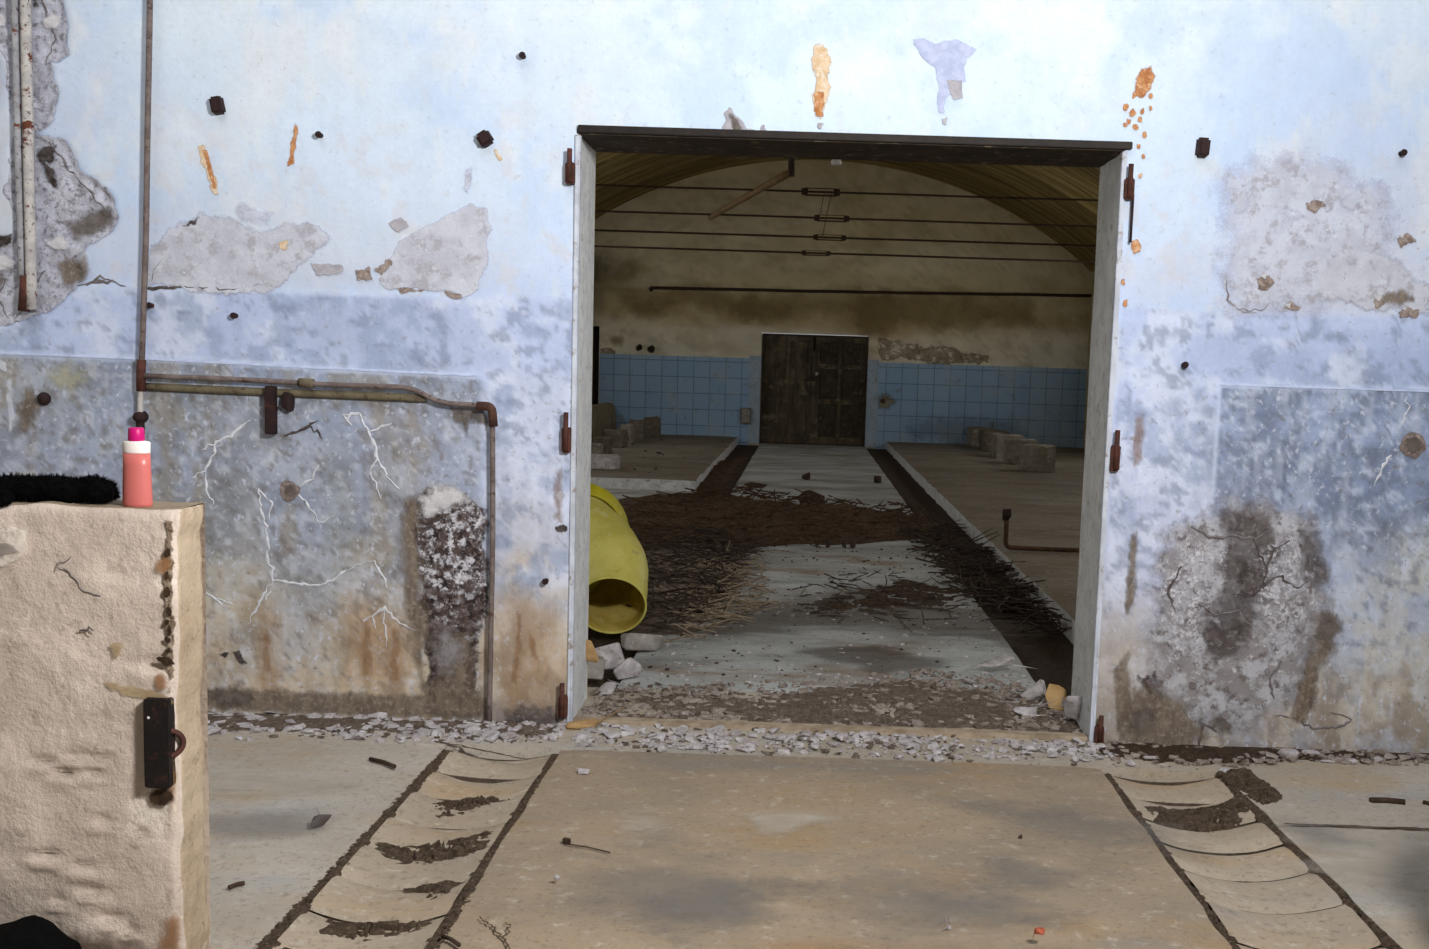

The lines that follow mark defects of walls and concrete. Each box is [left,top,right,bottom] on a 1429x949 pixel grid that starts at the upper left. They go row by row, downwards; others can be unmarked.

spalling [0,0,119,326]
corrosion [287,124,298,166]
corrosion [811,44,831,129]
peeling [914,39,976,125]
corrosion [1123,67,1155,178]
flaking render [148,203,492,299]
spalling [878,338,989,365]
crack [191,420,251,505]
crack [206,412,415,647]
leakage [207,485,490,718]
leakage [1123,671,1232,745]
leakage [1296,612,1339,722]